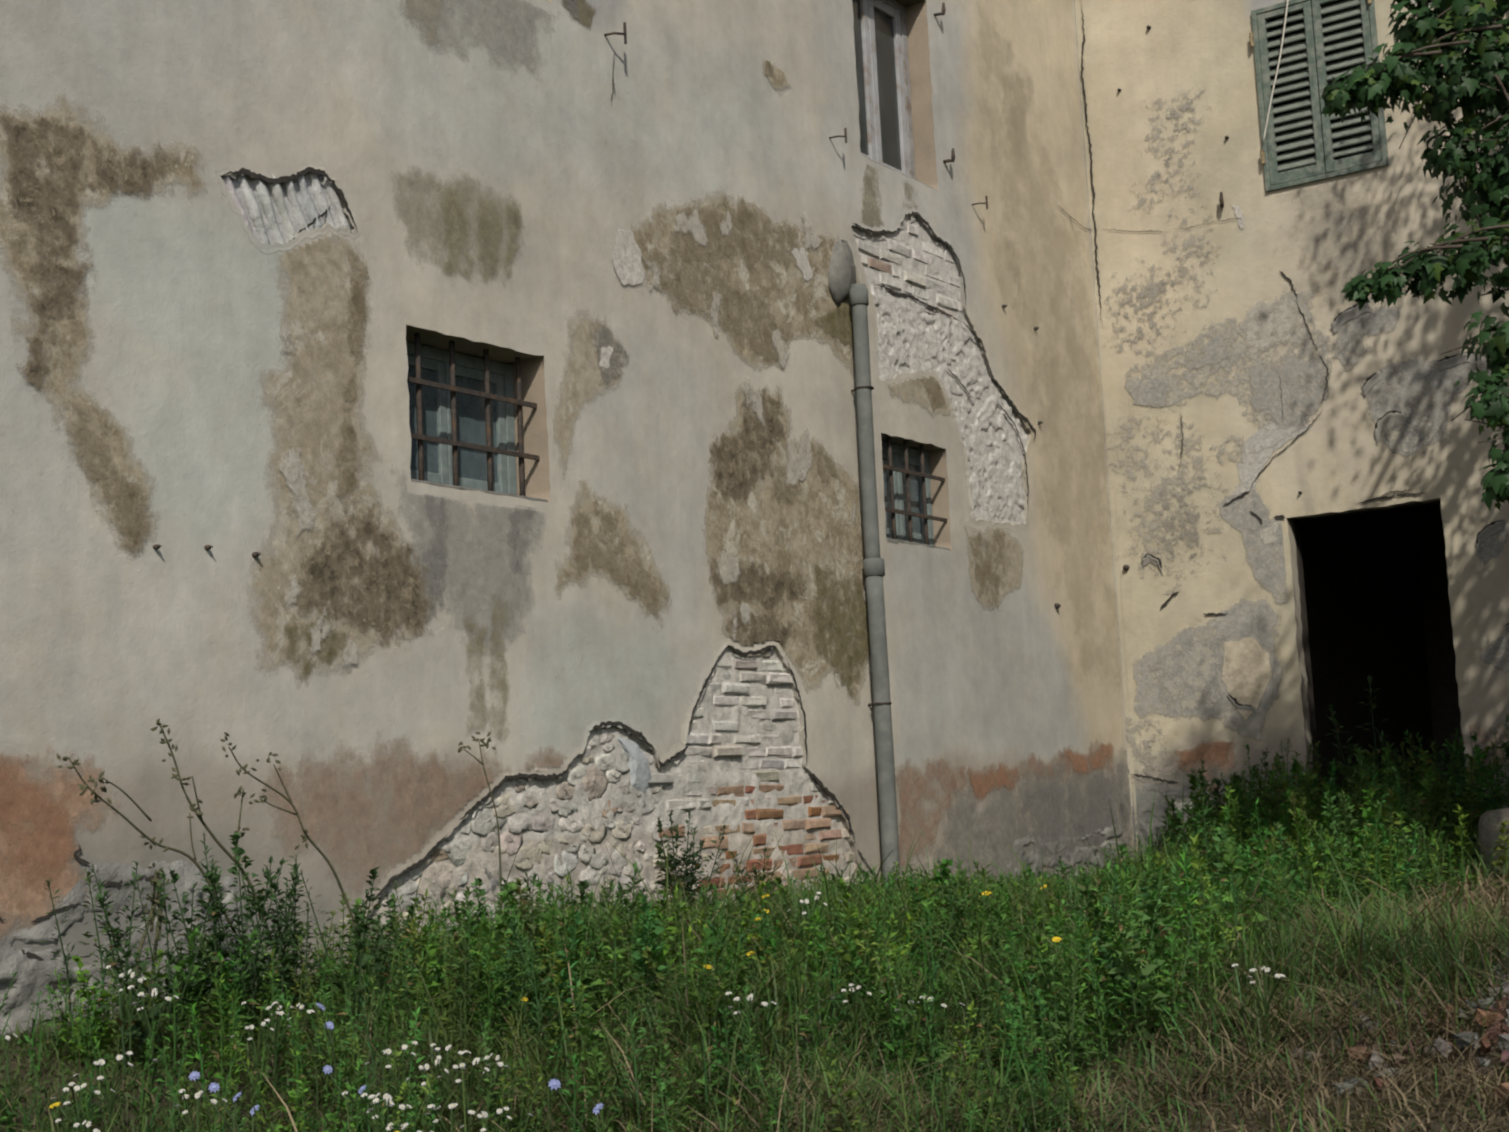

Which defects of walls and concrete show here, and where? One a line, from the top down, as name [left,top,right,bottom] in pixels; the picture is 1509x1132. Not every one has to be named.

water stain [0,96,205,551]
spalling [215,162,360,254]
water stain [248,236,544,736]
water stain [553,310,629,467]
water stain [556,481,670,622]
water stain [613,193,870,704]
spalling [847,206,1036,532]
crack [1055,1,1239,327]
flaking render [995,88,1491,883]
crack [1223,271,1329,524]
spalling [0,860,255,1036]
spalling [340,639,879,937]